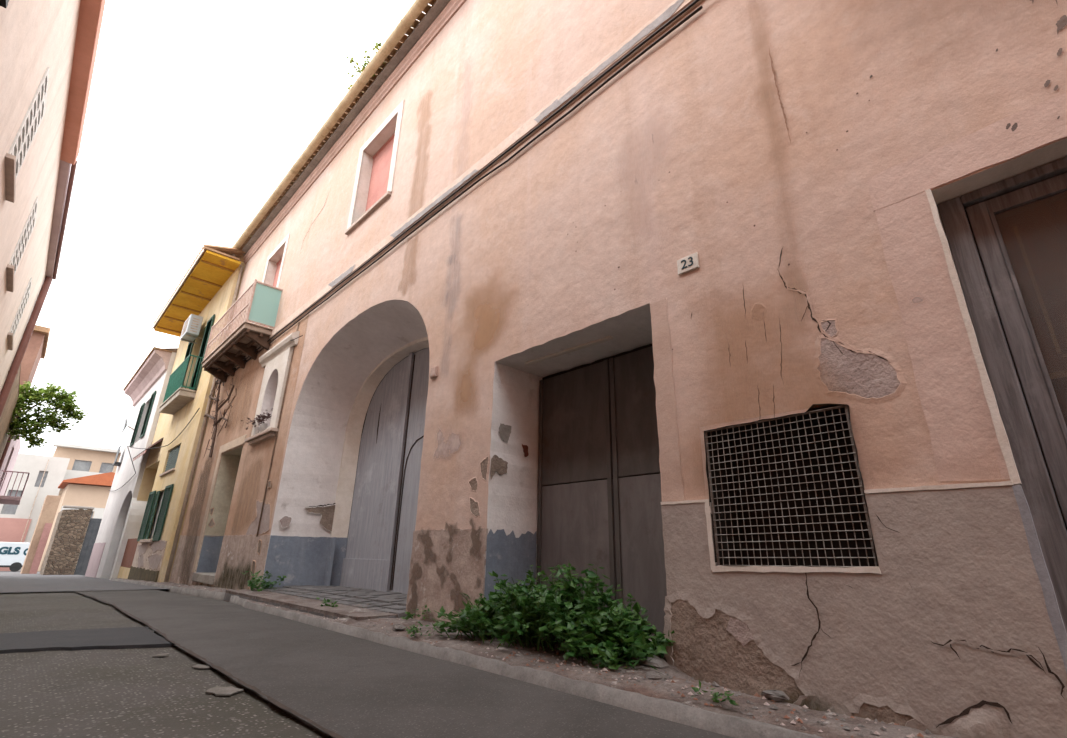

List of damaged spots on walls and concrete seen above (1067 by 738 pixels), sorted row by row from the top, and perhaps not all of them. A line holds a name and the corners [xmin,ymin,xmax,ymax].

crack [728,248,892,418]
spalling [812,319,907,404]
spalling [499,423,511,443]
flaking render [246,500,292,589]
spalling [304,504,336,532]
peeling [407,523,468,622]
spalling [468,455,508,558]
flaking render [663,591,815,706]
crack [791,573,830,676]
flaking render [825,693,925,729]
crack [932,639,1067,698]